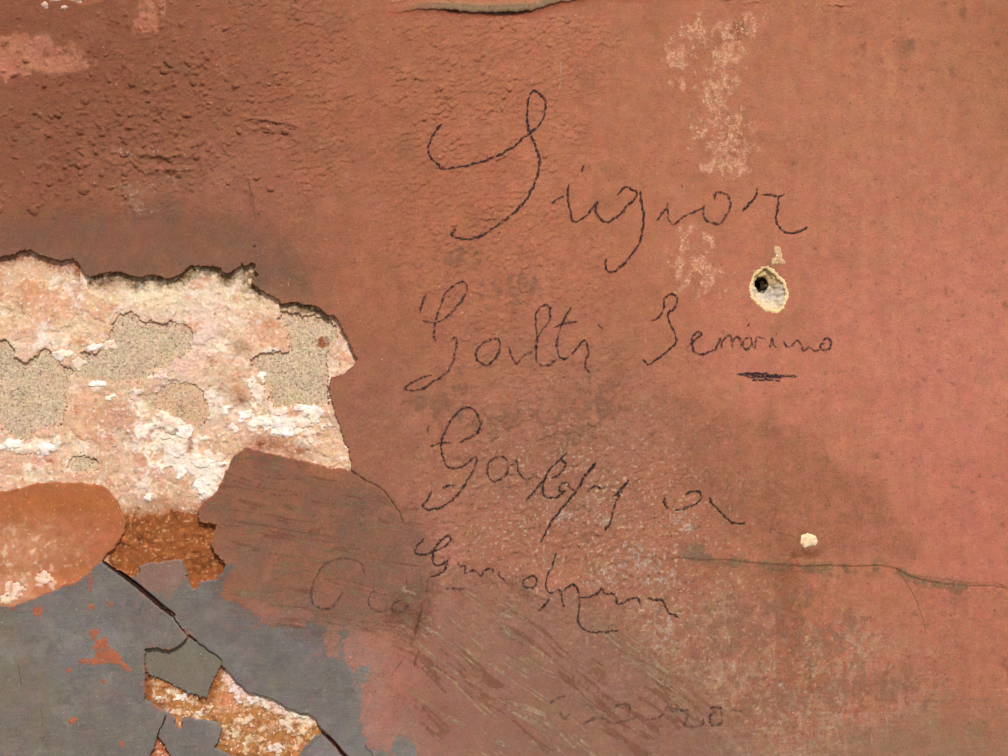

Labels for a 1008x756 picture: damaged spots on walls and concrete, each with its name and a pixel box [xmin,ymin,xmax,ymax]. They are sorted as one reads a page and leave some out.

spalling [0,250,417,756]
crack [103,561,196,641]
crack [727,528,1006,636]
crack [321,731,373,756]